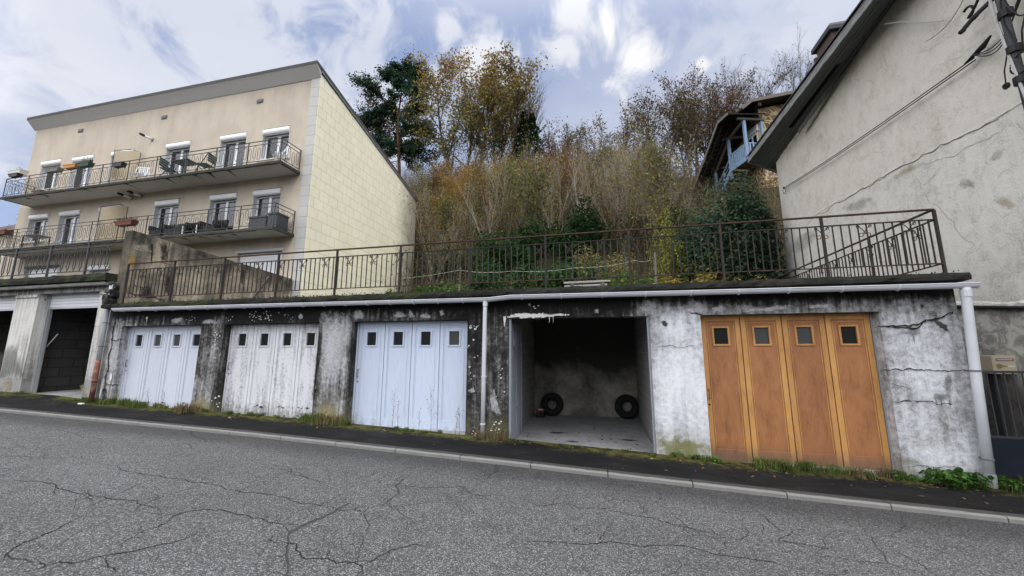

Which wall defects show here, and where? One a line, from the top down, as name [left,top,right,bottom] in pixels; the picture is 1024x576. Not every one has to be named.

crack [807,103,1022,262]
peeling [503,313,569,324]
crack [875,311,954,329]
water stain [312,311,363,396]
crack [882,368,964,405]